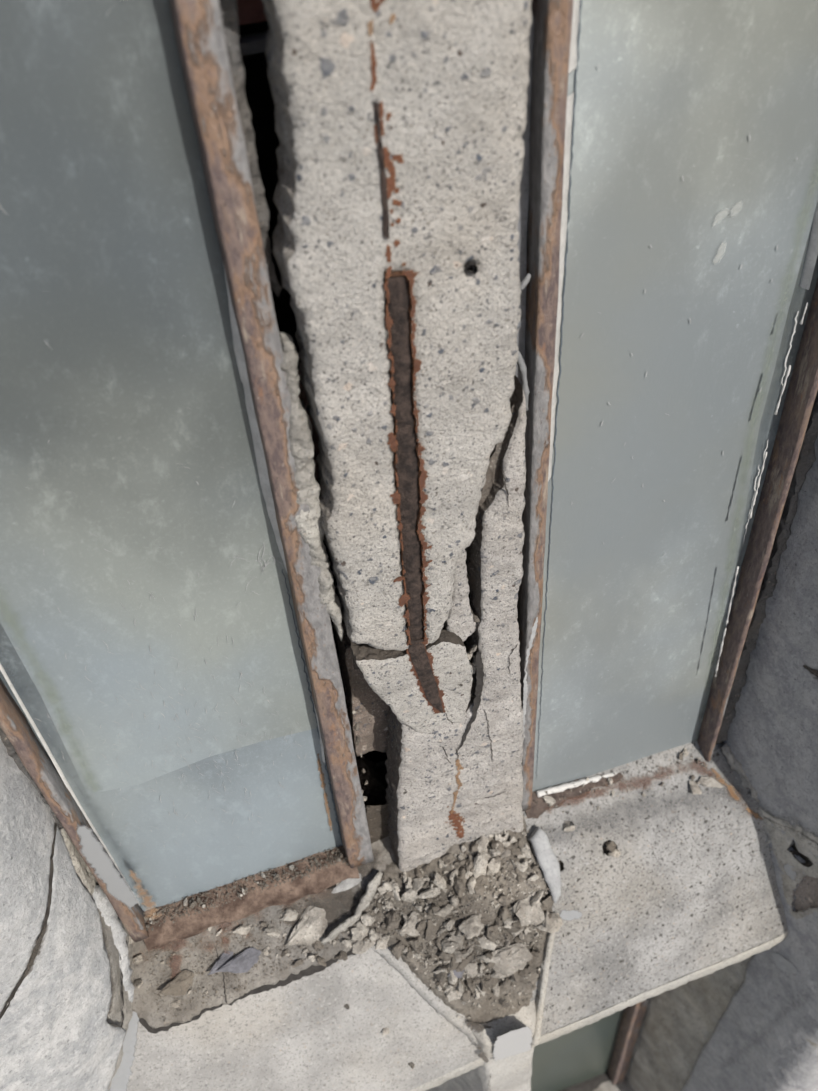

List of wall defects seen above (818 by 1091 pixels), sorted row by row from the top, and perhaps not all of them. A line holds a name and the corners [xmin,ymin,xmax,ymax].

corrosion [367,0,385,91]
corrosion [374,101,404,226]
corrosion [384,240,446,714]
crack [351,642,369,669]
crack [440,645,517,762]
corrosion [317,754,332,831]
corrosion [446,758,465,839]
corrosion [560,762,762,819]
crack [0,823,57,1019]
spalling [348,815,563,1063]